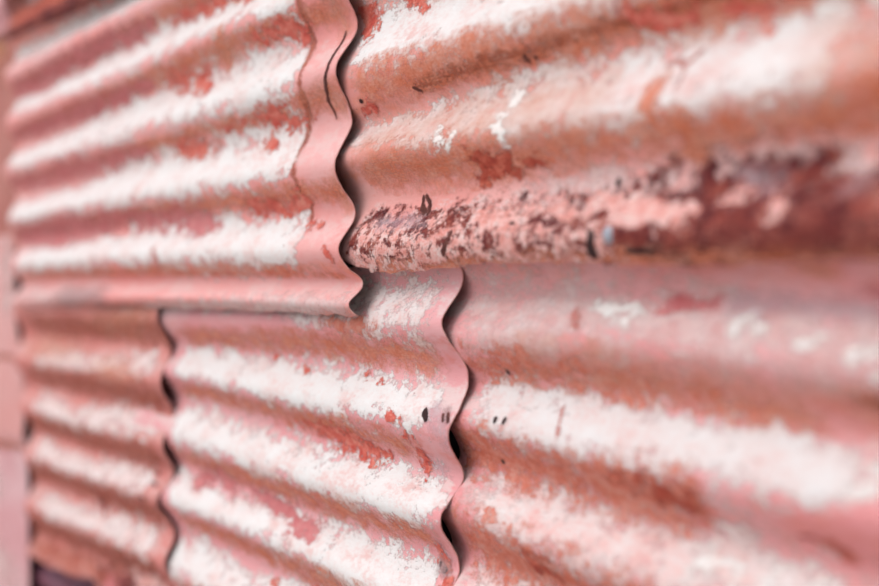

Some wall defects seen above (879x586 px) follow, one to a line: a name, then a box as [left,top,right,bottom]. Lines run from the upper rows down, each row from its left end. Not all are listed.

peeling [8,0,325,282]
rust [357,0,816,103]
rust [346,73,879,273]
peeling [348,0,879,206]
rust [26,413,162,471]
peeling [34,344,160,381]
peeling [29,388,165,567]
rust [26,509,169,586]
rust [28,460,168,529]
peeling [139,270,455,586]
rust [185,454,432,542]
peeling [467,368,879,586]